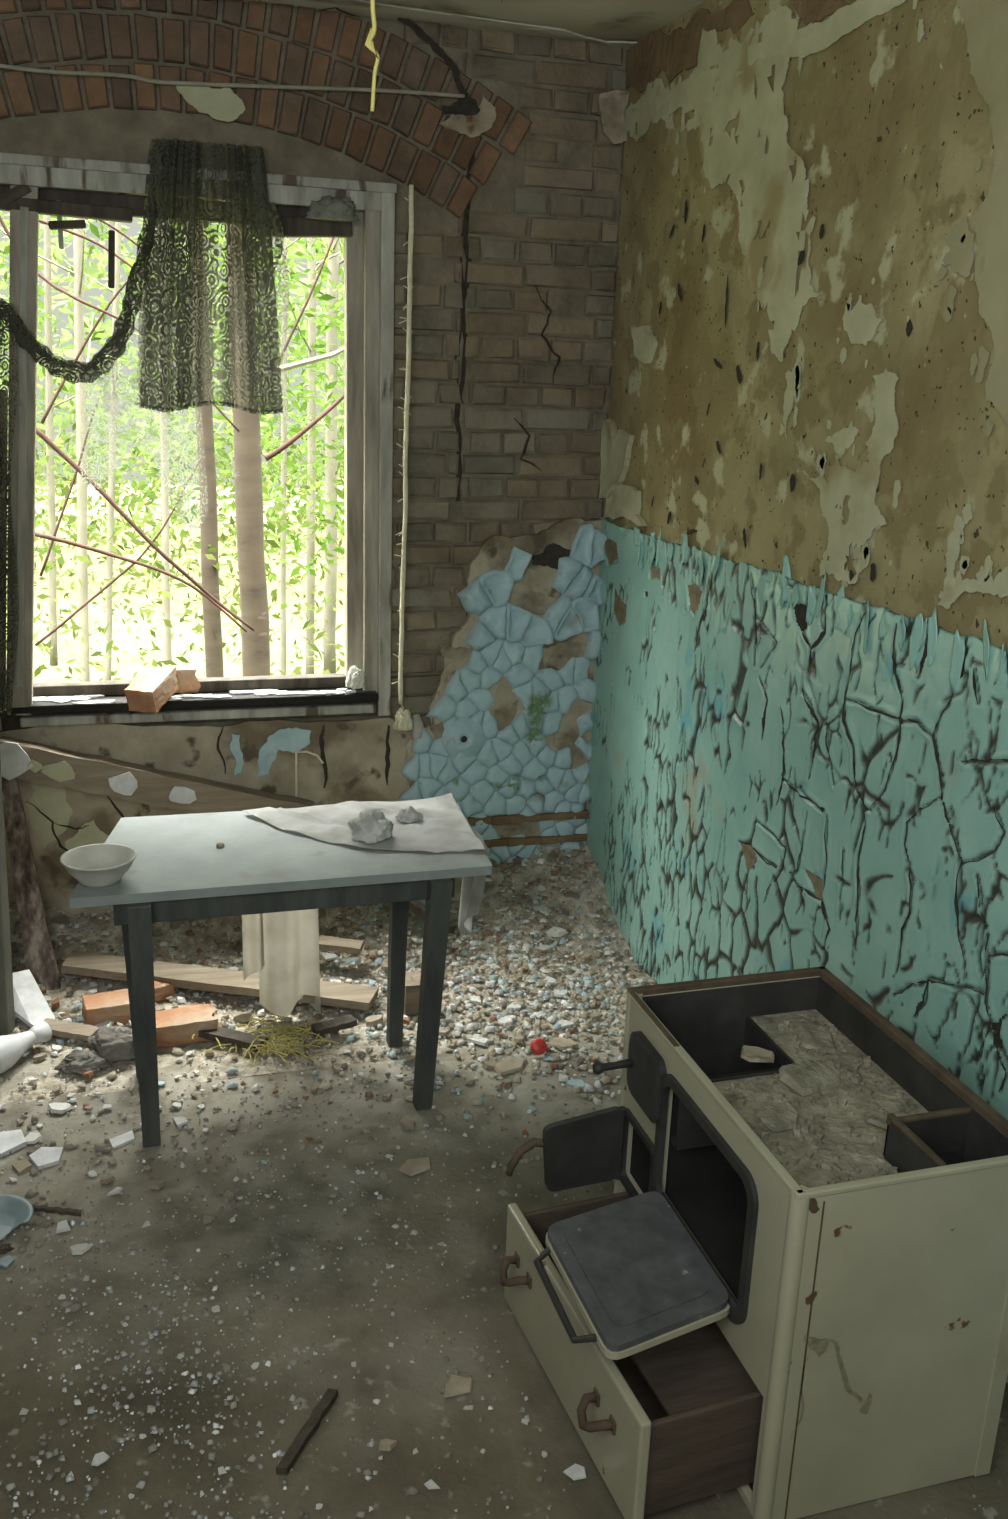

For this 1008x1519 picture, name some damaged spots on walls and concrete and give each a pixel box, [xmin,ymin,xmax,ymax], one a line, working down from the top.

crack [694,576,712,650]
peeling [399,277,1008,1120]
peeling [108,771,138,796]
peeling [168,786,197,804]
peeling [230,727,311,777]
crack [739,580,1008,1092]